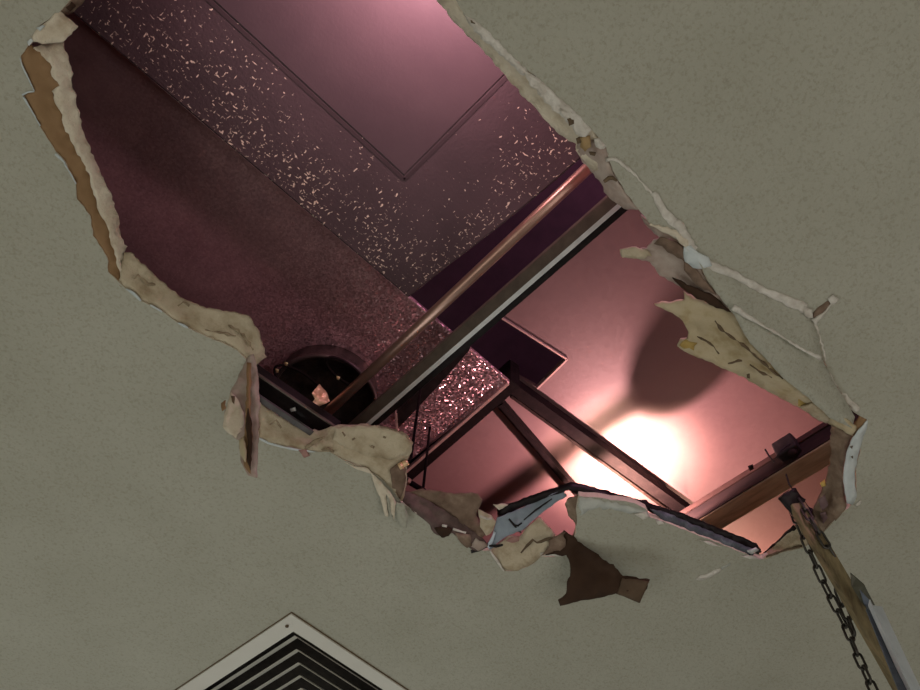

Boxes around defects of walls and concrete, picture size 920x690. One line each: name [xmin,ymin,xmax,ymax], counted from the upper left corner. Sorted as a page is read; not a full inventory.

spalling [61,0,85,16]
spalling [437,0,638,210]
spalling [119,252,267,364]
crack [606,157,822,360]
spalling [258,402,413,502]
spalling [654,291,867,532]
spalling [489,517,566,571]
peeling [565,495,664,525]
spalling [740,525,808,560]